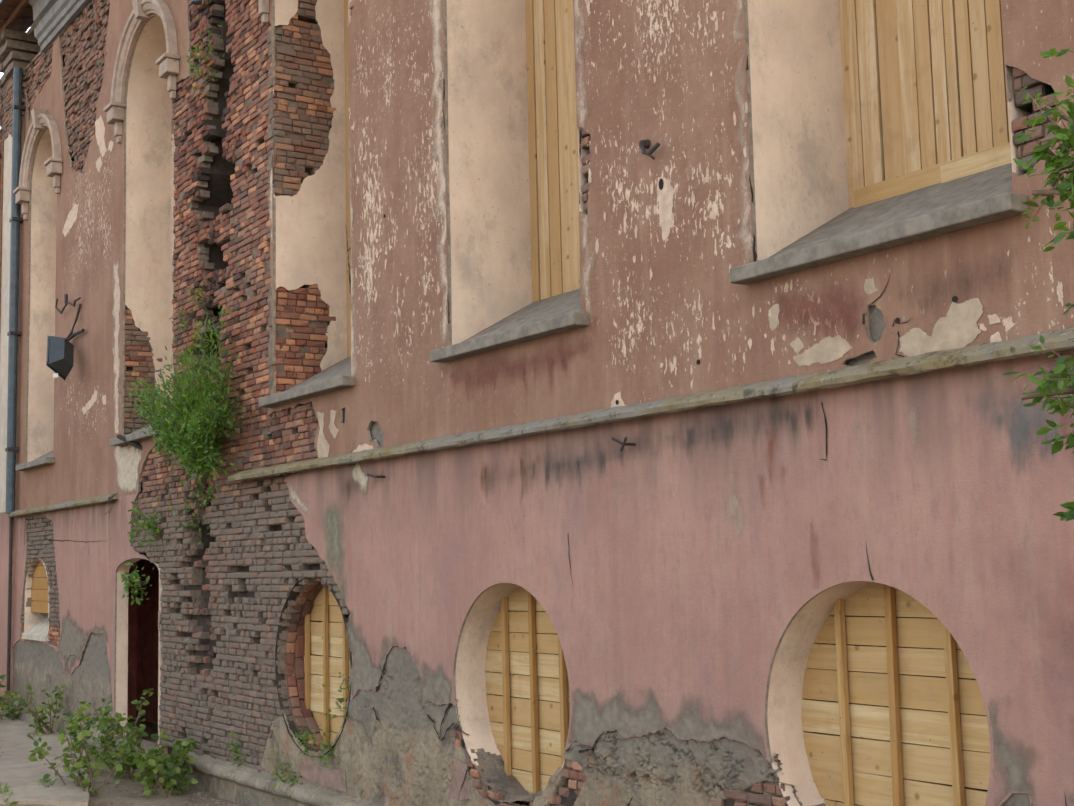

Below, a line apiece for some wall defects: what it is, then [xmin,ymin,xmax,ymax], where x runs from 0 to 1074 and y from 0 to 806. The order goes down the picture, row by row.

flaking render [0,0,802,806]
peeling [575,0,1074,408]